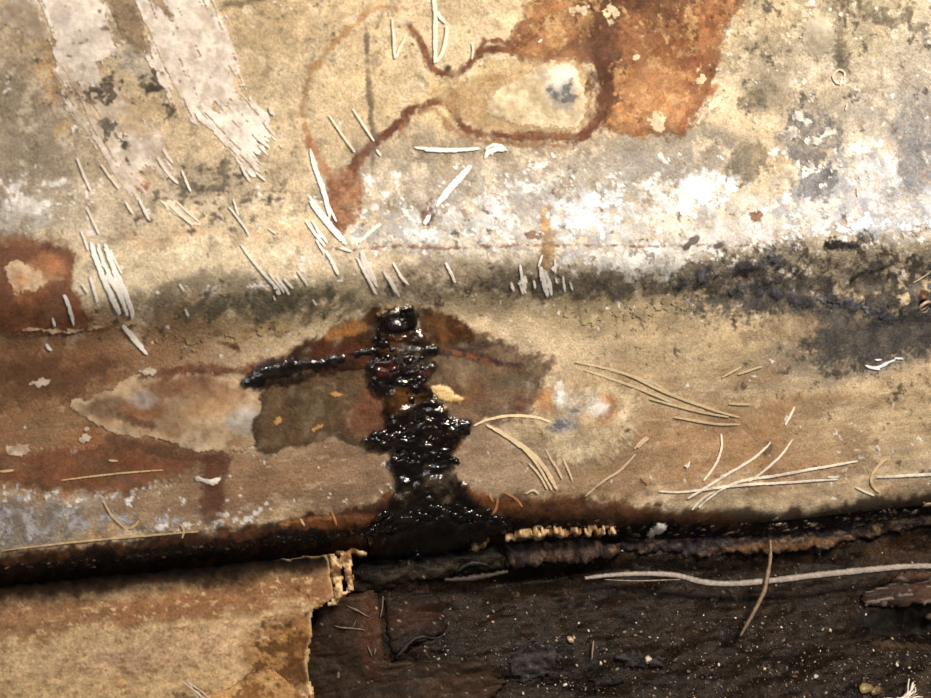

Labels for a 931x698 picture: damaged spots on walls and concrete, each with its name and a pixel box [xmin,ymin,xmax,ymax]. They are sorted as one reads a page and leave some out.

rust [301,0,744,232]
rust [0,234,94,335]
damp [352,102,931,374]
rust [0,357,111,409]
damp [252,368,393,456]
rust [0,435,200,497]